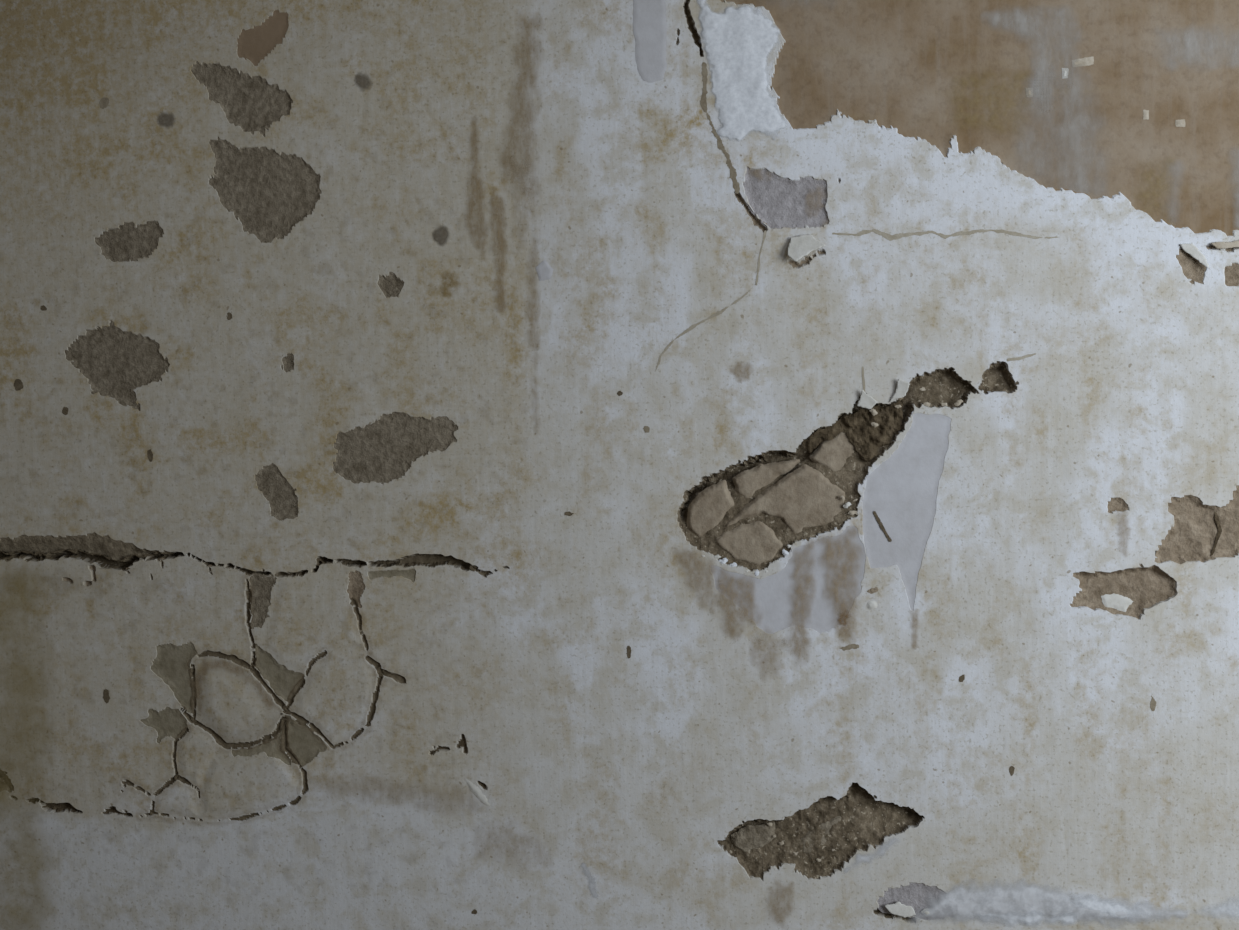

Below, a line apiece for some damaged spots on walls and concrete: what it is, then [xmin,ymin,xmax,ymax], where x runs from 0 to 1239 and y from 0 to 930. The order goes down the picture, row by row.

spalling [95,221,164,262]
spalling [191,10,321,243]
crack [656,0,767,369]
crack [832,229,1058,241]
peeling [697,0,1239,286]
spalling [65,321,170,411]
spalling [333,412,458,484]
leakage [825,540,856,636]
spalling [677,353,1036,634]
spalling [1070,486,1239,619]
crack [0,532,509,821]
spalling [717,782,924,879]